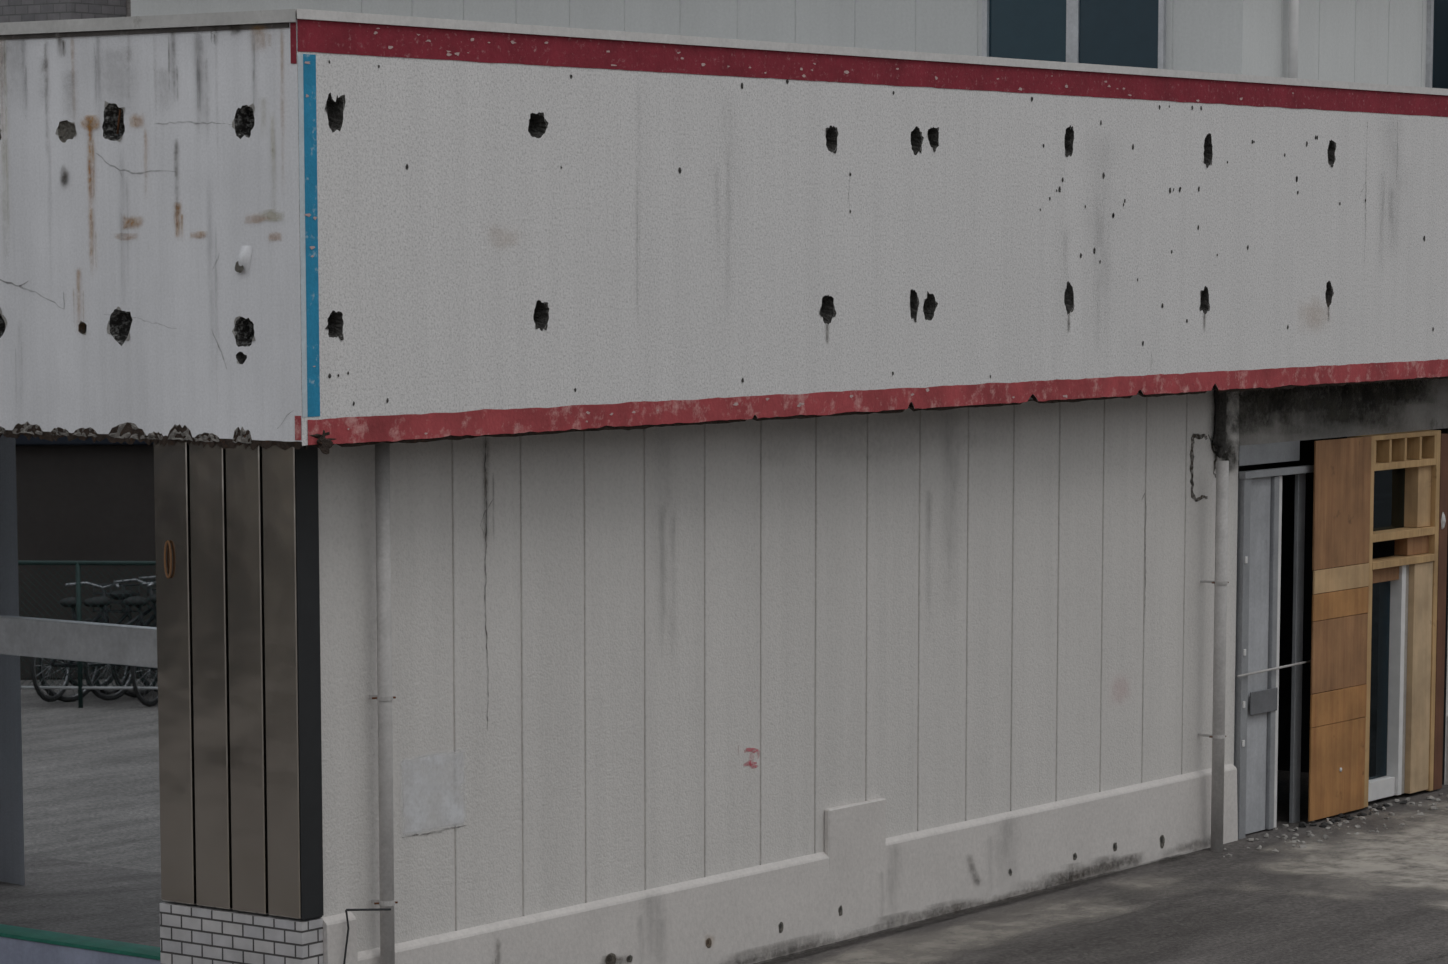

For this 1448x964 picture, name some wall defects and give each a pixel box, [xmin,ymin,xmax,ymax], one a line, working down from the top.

corrosion [82,117,97,192]
hole [102,101,125,142]
hole [232,104,255,139]
spalling [325,93,346,133]
hole [911,126,939,155]
spalling [1064,281,1074,325]
spalling [1186,286,1210,323]
spalling [1325,281,1334,316]
hole [107,307,133,346]
hole [232,316,255,364]
spalling [0,376,1448,454]